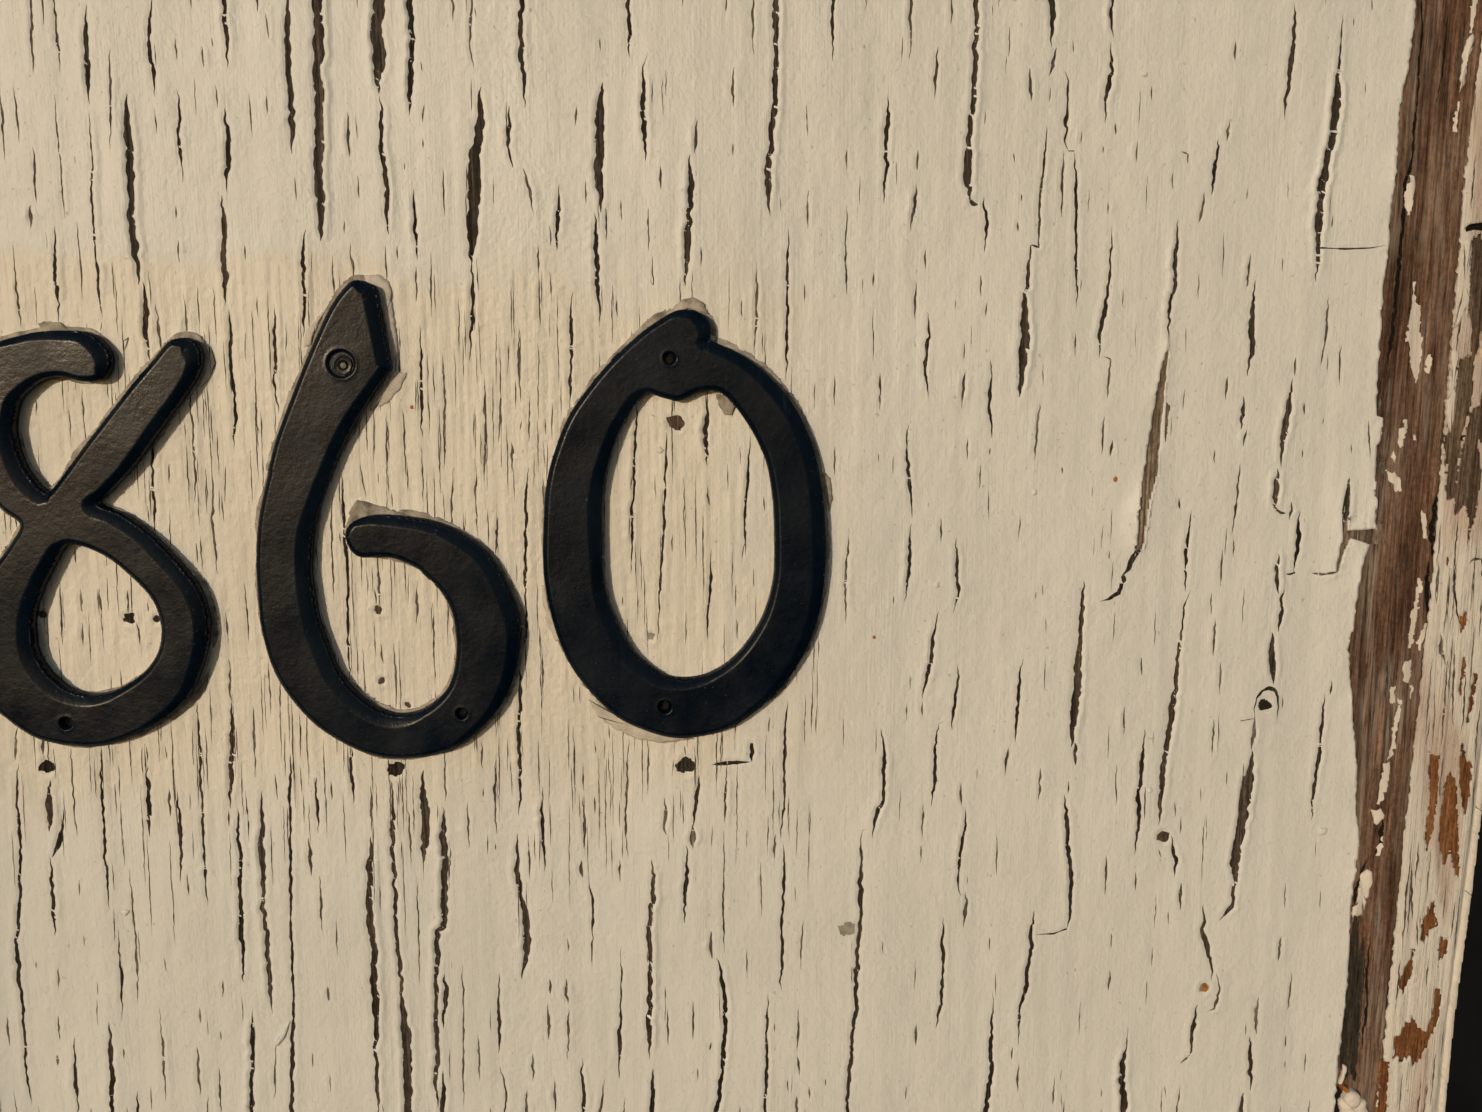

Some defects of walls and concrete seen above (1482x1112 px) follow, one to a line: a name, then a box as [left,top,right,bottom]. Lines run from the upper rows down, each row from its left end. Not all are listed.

peeling [1453,0,1478,132]
peeling [1404,175,1415,215]
crack [1448,153,1476,202]
peeling [1405,236,1482,536]
peeling [1381,419,1416,492]
crack [844,0,1463,1112]
peeling [1336,516,1386,573]
crack [1396,496,1482,833]
peeling [1351,578,1428,917]
peeling [1425,750,1472,876]
peeling [1399,901,1448,989]
peeling [1374,989,1441,1112]